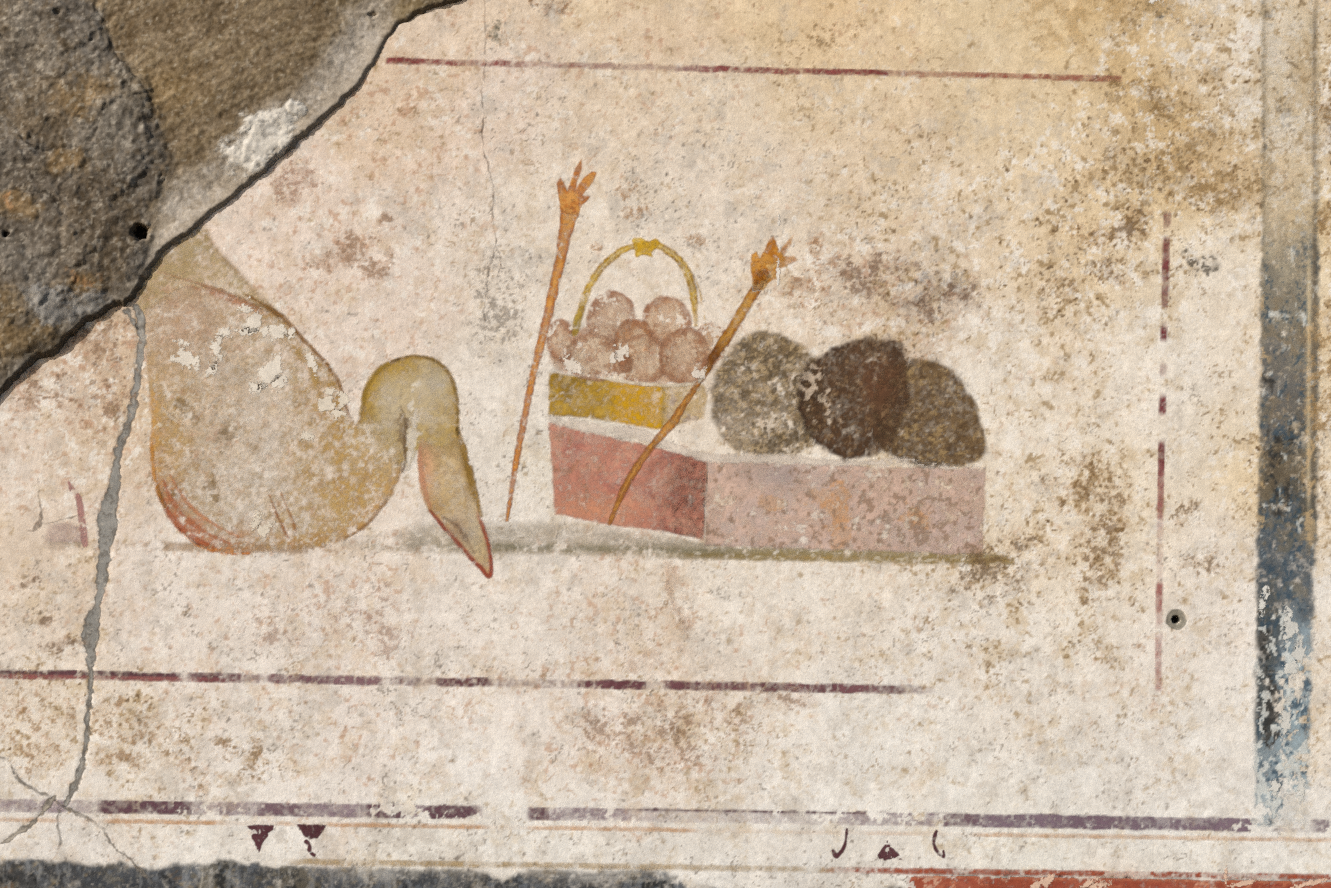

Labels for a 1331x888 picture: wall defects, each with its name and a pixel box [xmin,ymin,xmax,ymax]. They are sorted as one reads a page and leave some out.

spalling [0,0,462,396]
crack [1,304,147,877]
peeling [251,511,275,537]
peeling [317,387,350,420]